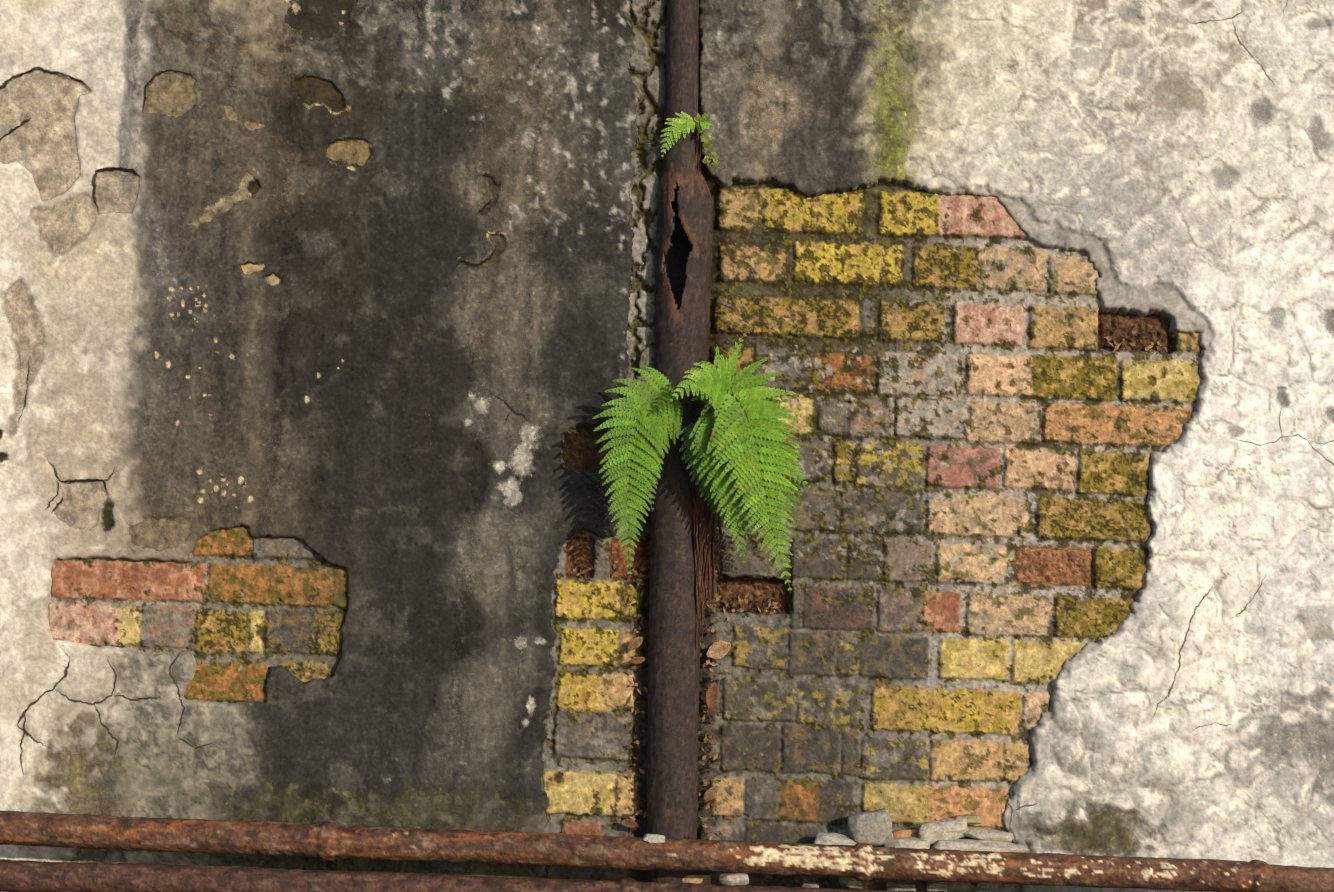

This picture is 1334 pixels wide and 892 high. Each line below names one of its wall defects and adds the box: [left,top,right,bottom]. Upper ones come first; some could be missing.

flaking render [285,0,358,41]
crack [1195,12,1274,84]
flaking render [0,67,140,255]
crack [46,463,114,509]
leakage [119,0,639,826]
flaking render [542,0,667,837]
flaking render [697,135,1203,844]
crack [1239,411,1334,465]
crack [17,650,211,772]
flaking render [48,516,348,703]
crack [1155,590,1210,712]
flaking render [697,871,1020,892]